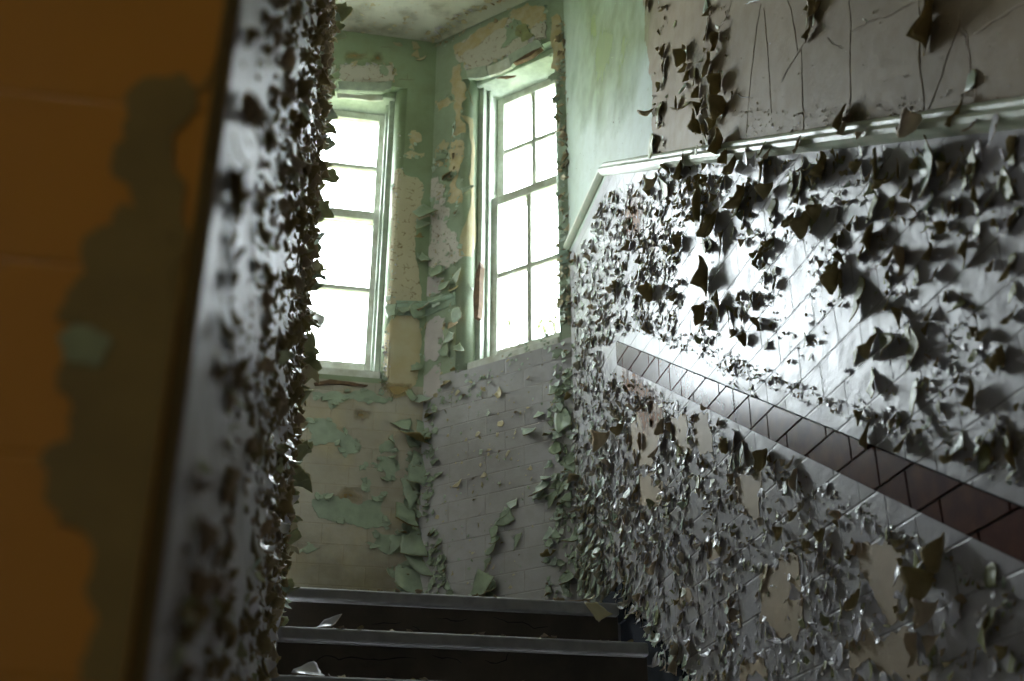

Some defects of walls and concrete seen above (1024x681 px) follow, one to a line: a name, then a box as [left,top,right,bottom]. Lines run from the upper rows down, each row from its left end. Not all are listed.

peeling [164,0,397,681]
flaking render [379,0,1024,681]